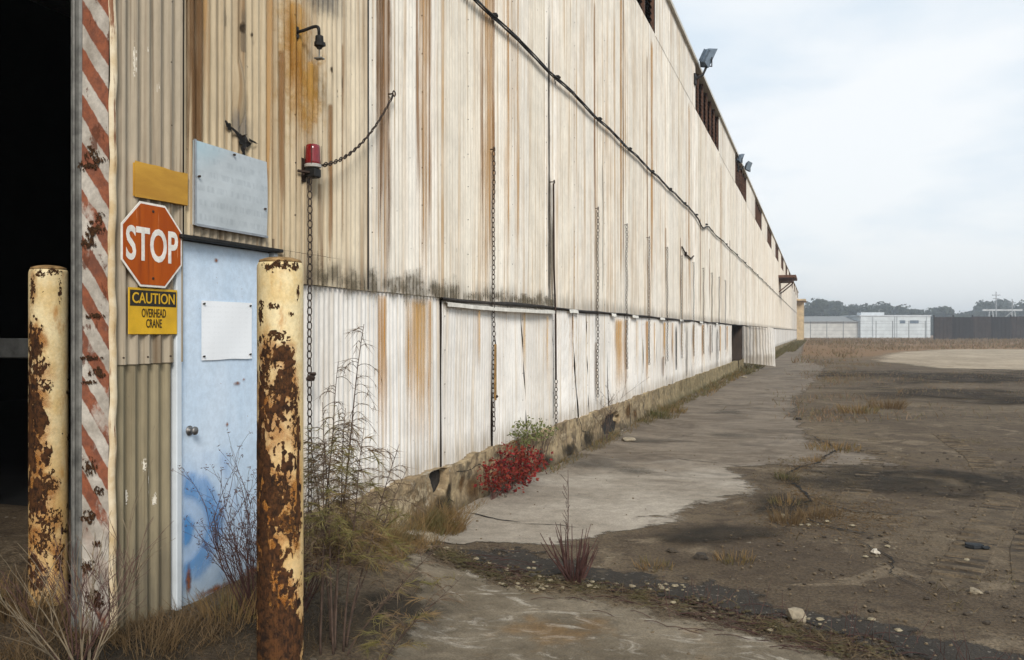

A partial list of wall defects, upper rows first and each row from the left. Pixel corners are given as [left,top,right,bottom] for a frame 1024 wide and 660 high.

rust [408,302,431,388]
spalling [601,414,626,436]
crack [636,434,932,594]